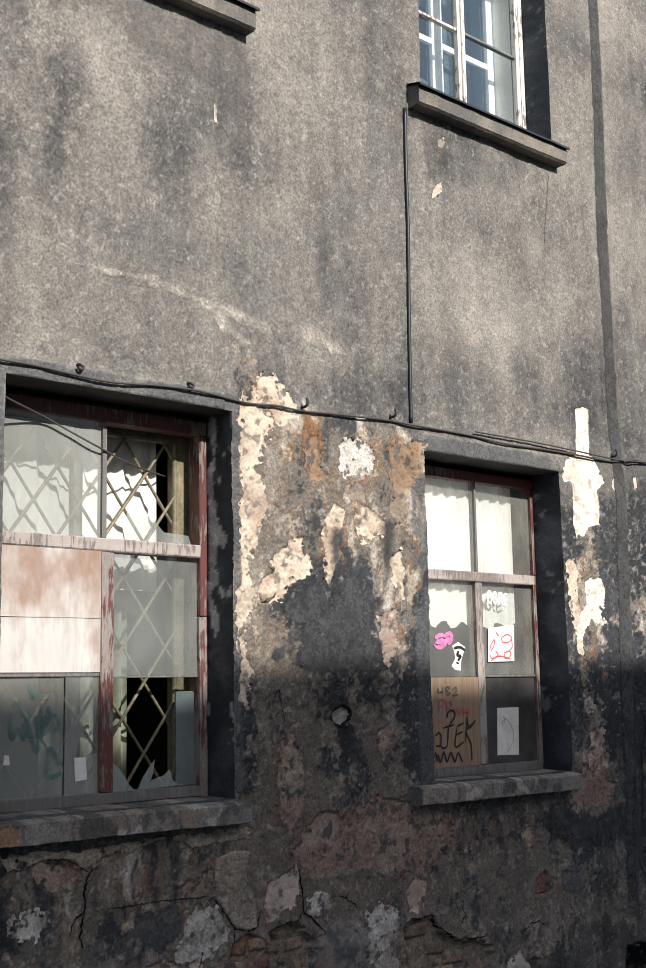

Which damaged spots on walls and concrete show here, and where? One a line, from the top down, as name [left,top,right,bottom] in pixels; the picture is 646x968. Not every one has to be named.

corrosion [300,408,328,482]
peeling [562,407,615,538]
peeling [234,369,428,710]
water stain [331,529,342,577]
water stain [383,522,394,582]
peeling [565,558,607,656]
spalling [332,707,349,725]
peeling [0,722,497,968]
crack [48,835,325,965]
crack [404,907,487,941]
spalling [507,950,531,968]